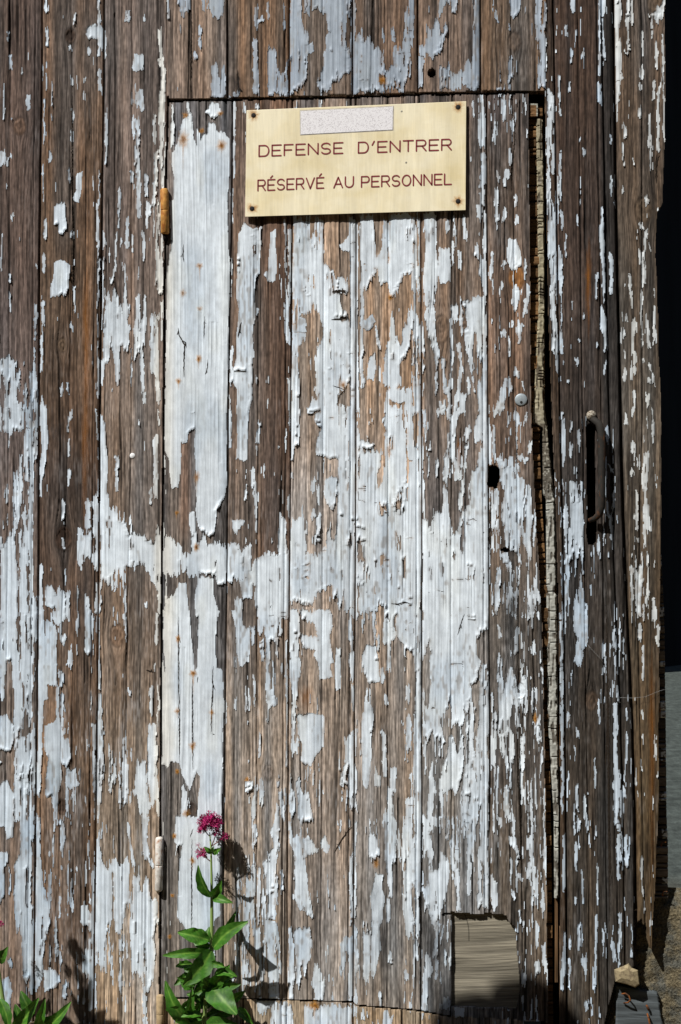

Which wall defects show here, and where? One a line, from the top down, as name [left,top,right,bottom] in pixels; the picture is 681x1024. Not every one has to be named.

peeling [70,0,107,101]
peeling [166,0,190,33]
peeling [202,0,225,20]
peeling [252,1,270,94]
peeling [267,0,457,108]
peeling [439,0,480,91]
peeling [597,0,665,171]
peeling [0,26,548,1024]
peeling [555,175,660,1024]